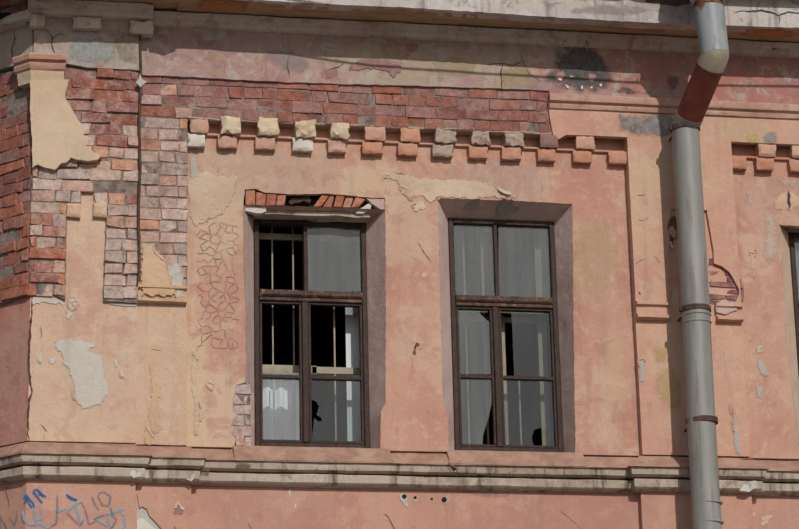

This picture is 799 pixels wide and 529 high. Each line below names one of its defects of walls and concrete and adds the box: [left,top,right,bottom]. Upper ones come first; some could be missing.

crack [737,2,799,24]
crack [487,54,540,91]
flaking render [0,58,552,319]
spalling [667,216,678,249]
spalling [709,258,744,315]
peeling [37,338,109,409]
flaking render [137,498,161,529]